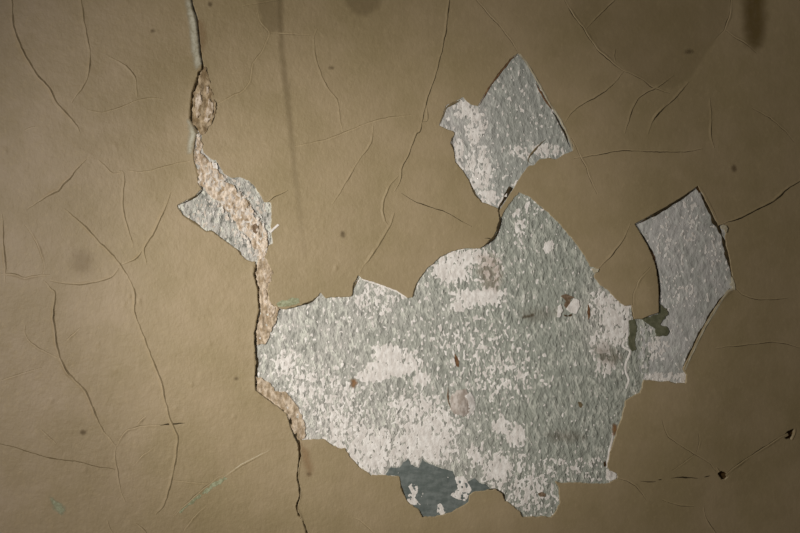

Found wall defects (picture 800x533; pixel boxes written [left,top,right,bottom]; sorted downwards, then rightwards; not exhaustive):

crack [9,0,138,134]
crack [186,0,216,152]
flaking render [178,131,279,265]
crack [358,0,472,273]
crack [485,186,513,246]
crack [564,0,624,122]
crack [574,74,715,159]
crack [717,178,800,226]
crack [0,158,183,515]
crack [255,257,280,345]
peeling [255,54,736,517]